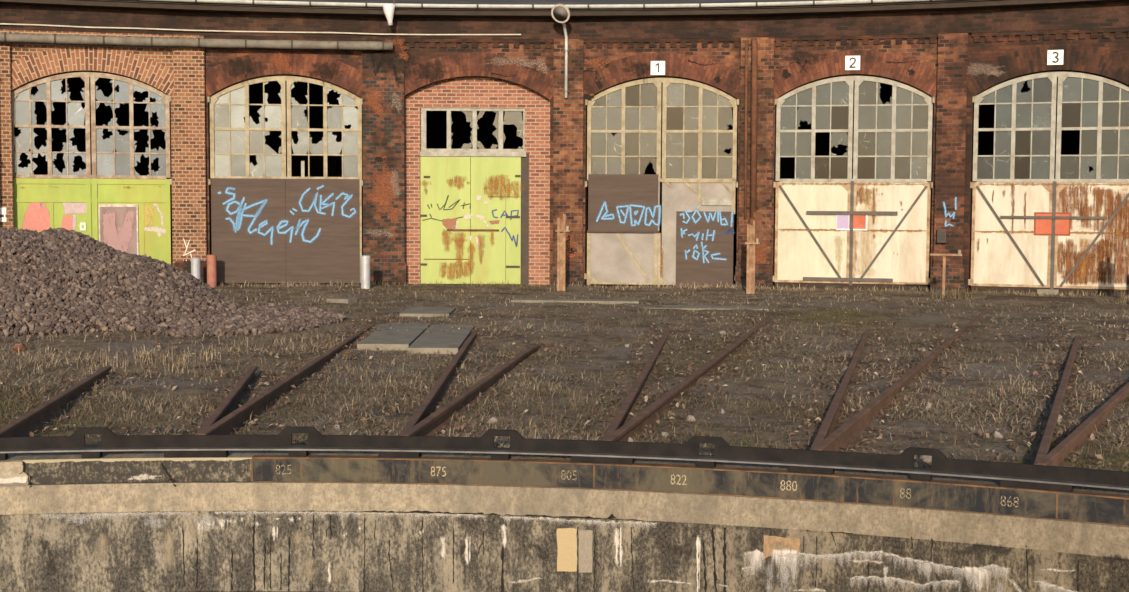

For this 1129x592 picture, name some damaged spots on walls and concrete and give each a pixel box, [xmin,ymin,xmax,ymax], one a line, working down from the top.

corrosion [485,176,519,198]
corrosion [441,230,494,280]
corrosion [977,183,1129,284]
spalling [0,461,30,487]
leakage [501,515,656,565]
leakage [648,537,701,592]
leakage [743,535,1021,592]
leakage [1028,555,1074,592]